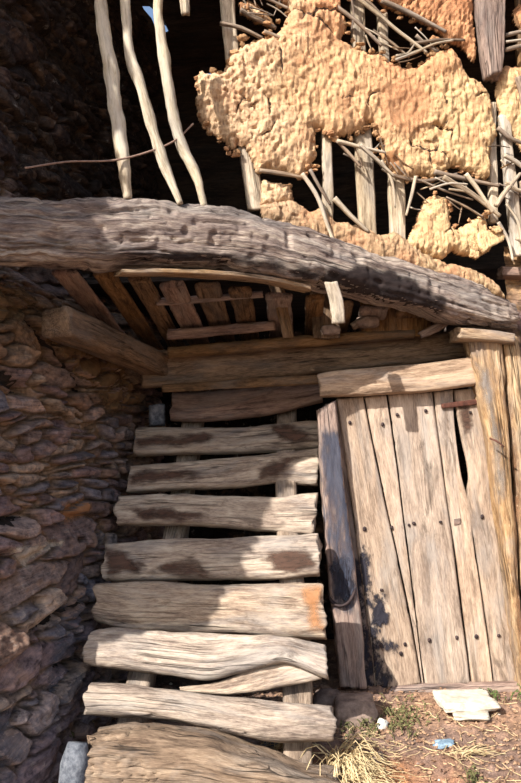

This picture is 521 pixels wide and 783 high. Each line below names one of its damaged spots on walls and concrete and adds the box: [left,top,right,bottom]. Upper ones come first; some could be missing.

spalling [344,6,450,69]
spalling [314,121,492,200]
crack [407,95,453,164]
peeling [469,210,505,259]
water stain [320,431,398,688]
water stain [303,587,320,627]